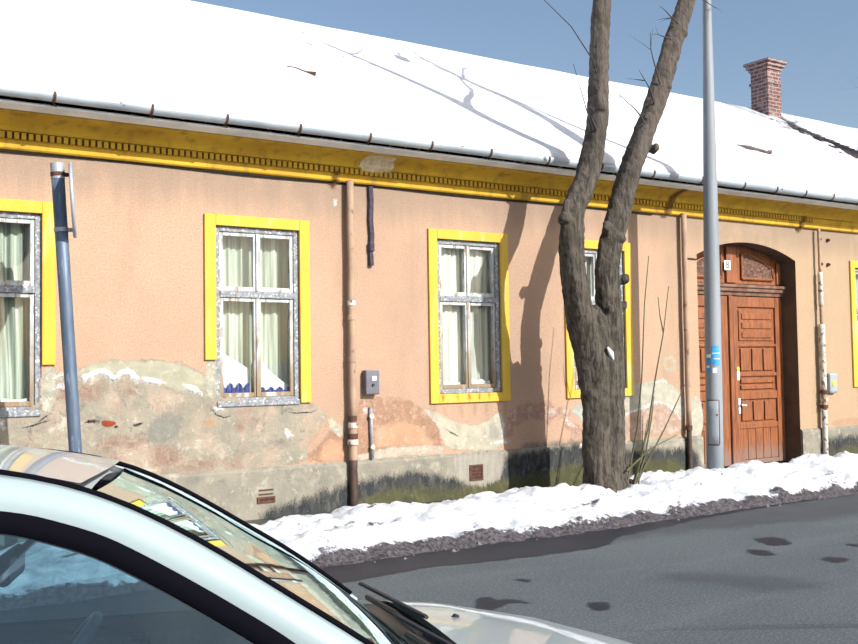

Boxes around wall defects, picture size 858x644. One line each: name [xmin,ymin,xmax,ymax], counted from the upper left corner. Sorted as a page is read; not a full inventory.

flaking render [0,365,69,451]
flaking render [77,358,446,475]
leakage [257,437,584,519]
flaking render [491,400,582,448]
flaking render [624,378,685,437]
leakage [626,445,701,477]
leakage [819,434,858,456]